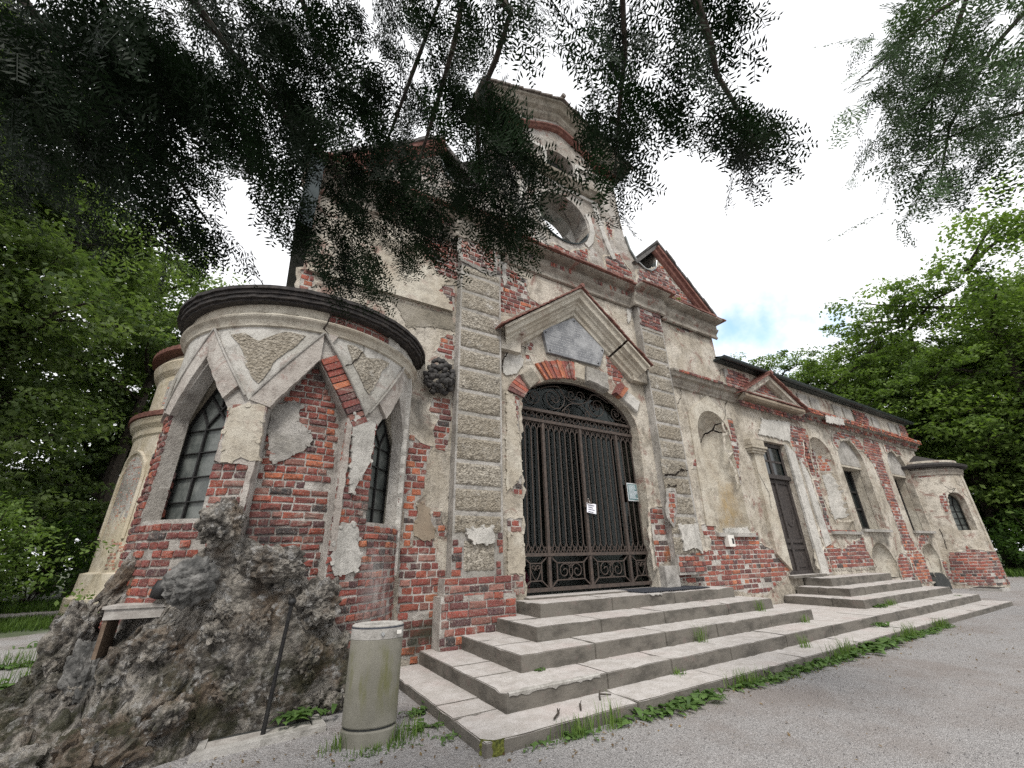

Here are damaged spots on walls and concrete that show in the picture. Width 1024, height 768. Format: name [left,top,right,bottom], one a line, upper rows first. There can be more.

spalling [294,267,319,291]
peeling [347,237,540,362]
peeling [220,400,313,465]
crack [700,402,727,443]
peeling [329,521,363,577]
spalling [396,394,453,664]
peeling [464,514,527,597]
crack [664,468,688,487]
spalling [647,488,791,598]
spalling [758,415,1010,587]